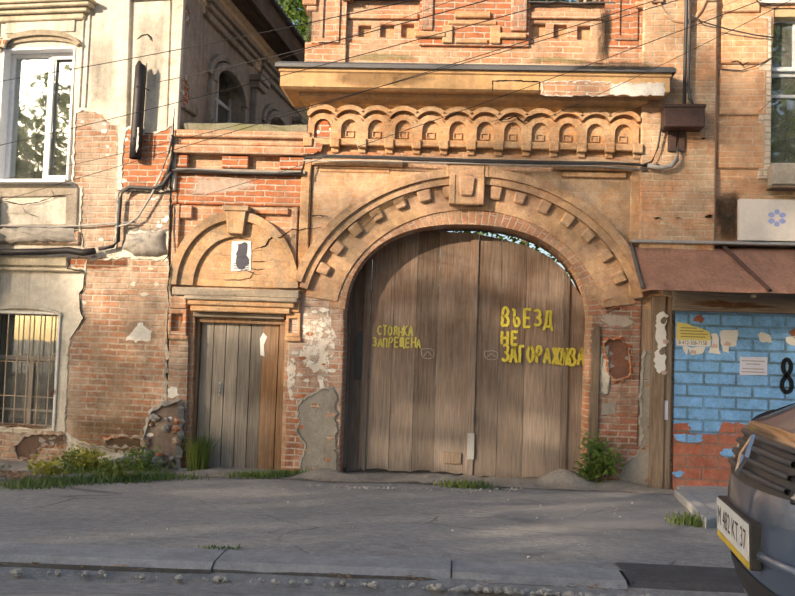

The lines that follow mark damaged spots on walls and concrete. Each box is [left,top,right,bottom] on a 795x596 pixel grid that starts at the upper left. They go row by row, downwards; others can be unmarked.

water stain [580,12,650,70]
crack [0,191,73,217]
crack [231,178,328,280]
spalling [0,108,185,471]
peeling [286,308,340,472]
spalling [599,336,651,480]
peeling [673,423,703,443]
peeling [718,422,746,436]